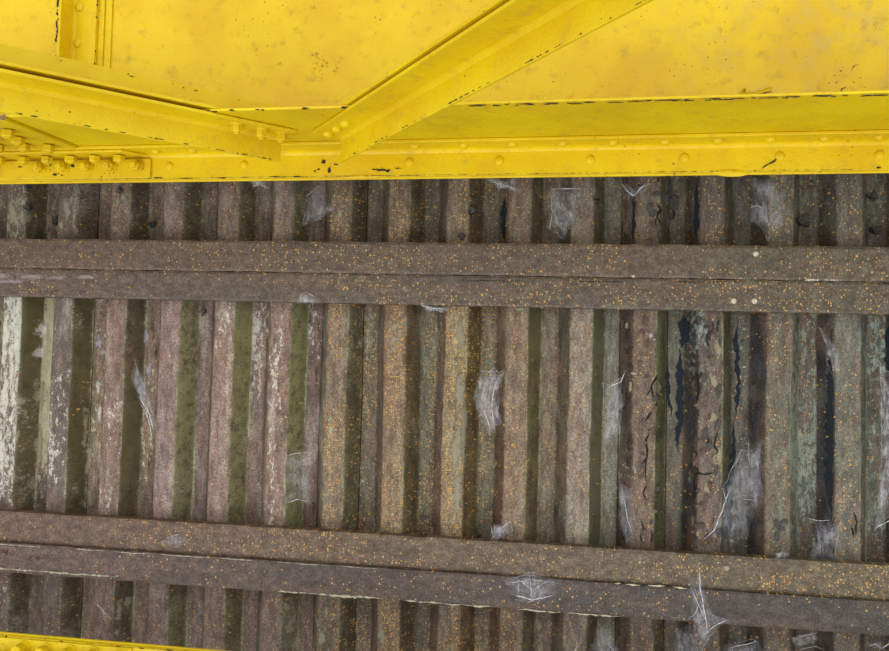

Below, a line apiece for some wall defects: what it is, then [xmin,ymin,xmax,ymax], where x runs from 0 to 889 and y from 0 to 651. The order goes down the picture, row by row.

peeling [0,304,15,482]
peeling [629,315,661,423]
peeling [687,317,725,544]